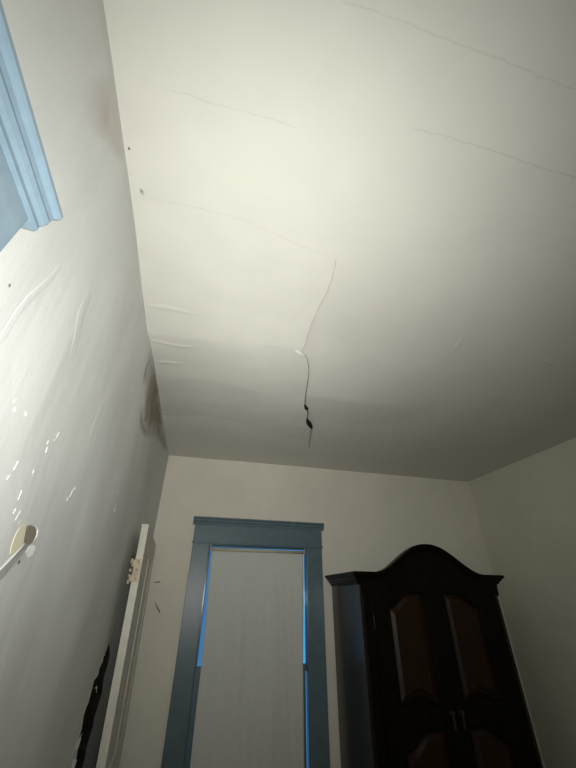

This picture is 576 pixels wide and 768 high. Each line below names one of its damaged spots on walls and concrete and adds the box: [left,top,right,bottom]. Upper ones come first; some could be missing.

crack [295,350,313,439]
spalling [71,642,110,768]